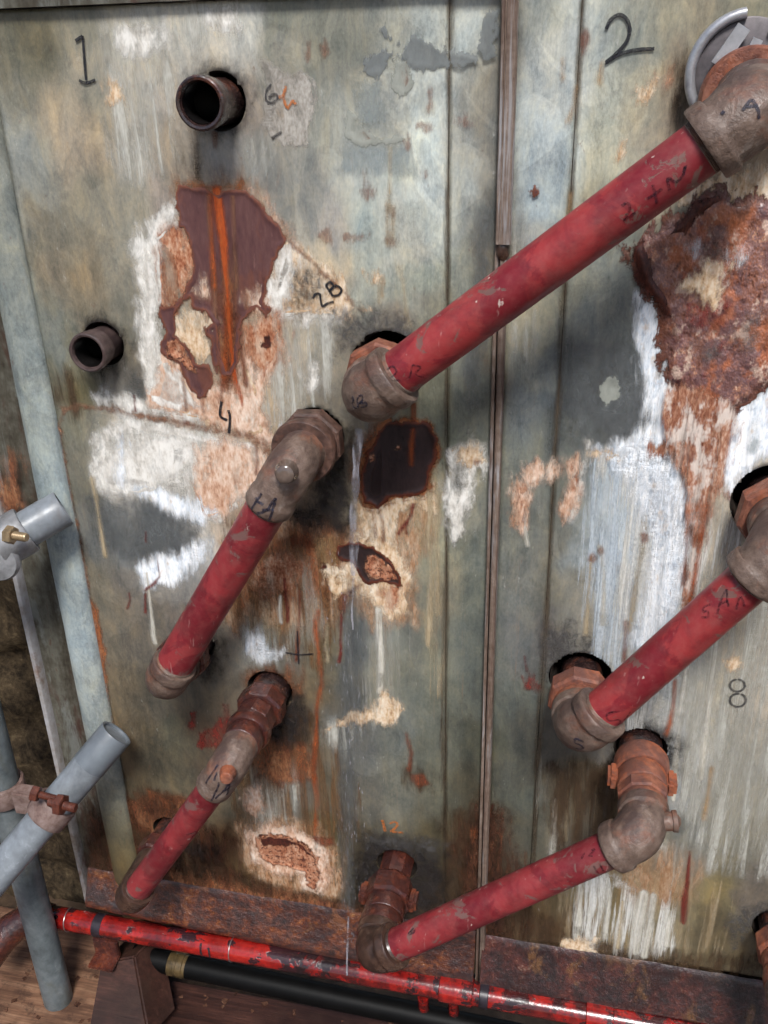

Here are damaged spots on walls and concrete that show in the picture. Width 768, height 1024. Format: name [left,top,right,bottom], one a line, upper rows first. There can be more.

peeling [363,9,500,98]
rust [130,178,296,449]
rust [594,163,768,609]
efflorescence [90,391,267,557]
rust [225,404,447,670]
peeling [509,440,591,546]
damp [578,436,741,671]
damp [546,761,618,855]
damp [627,702,647,731]
damp [667,601,768,876]
efflorescence [560,873,675,959]